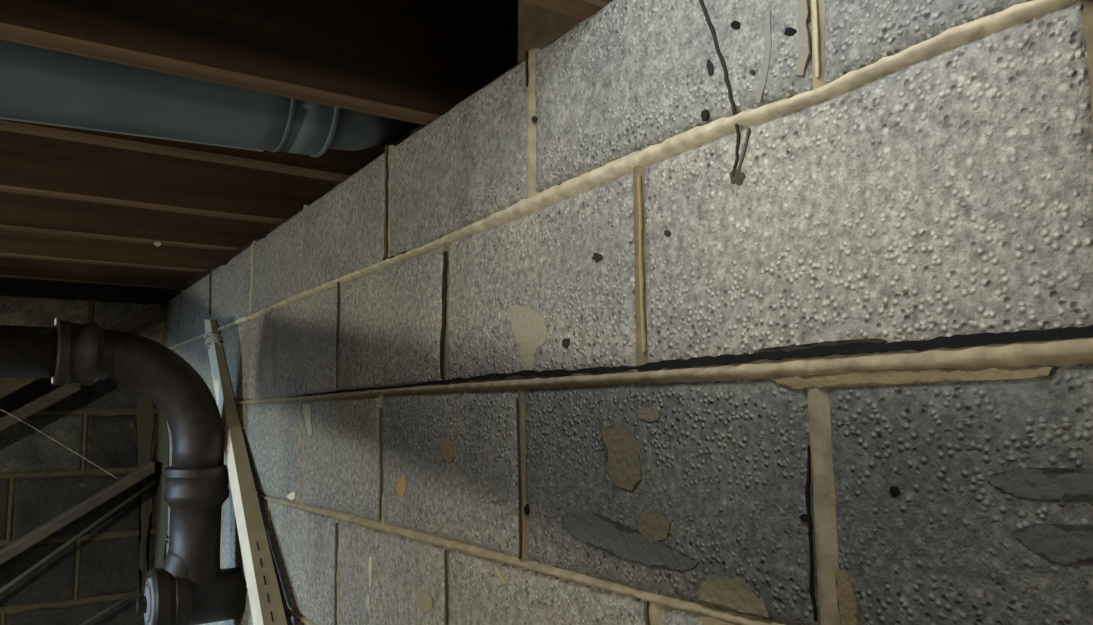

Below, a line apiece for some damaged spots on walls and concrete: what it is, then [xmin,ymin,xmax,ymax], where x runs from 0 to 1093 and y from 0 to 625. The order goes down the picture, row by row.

crack [699,0,751,176]
crack [271,251,1093,559]
crack [805,446,818,621]
leakage [1011,523,1093,564]